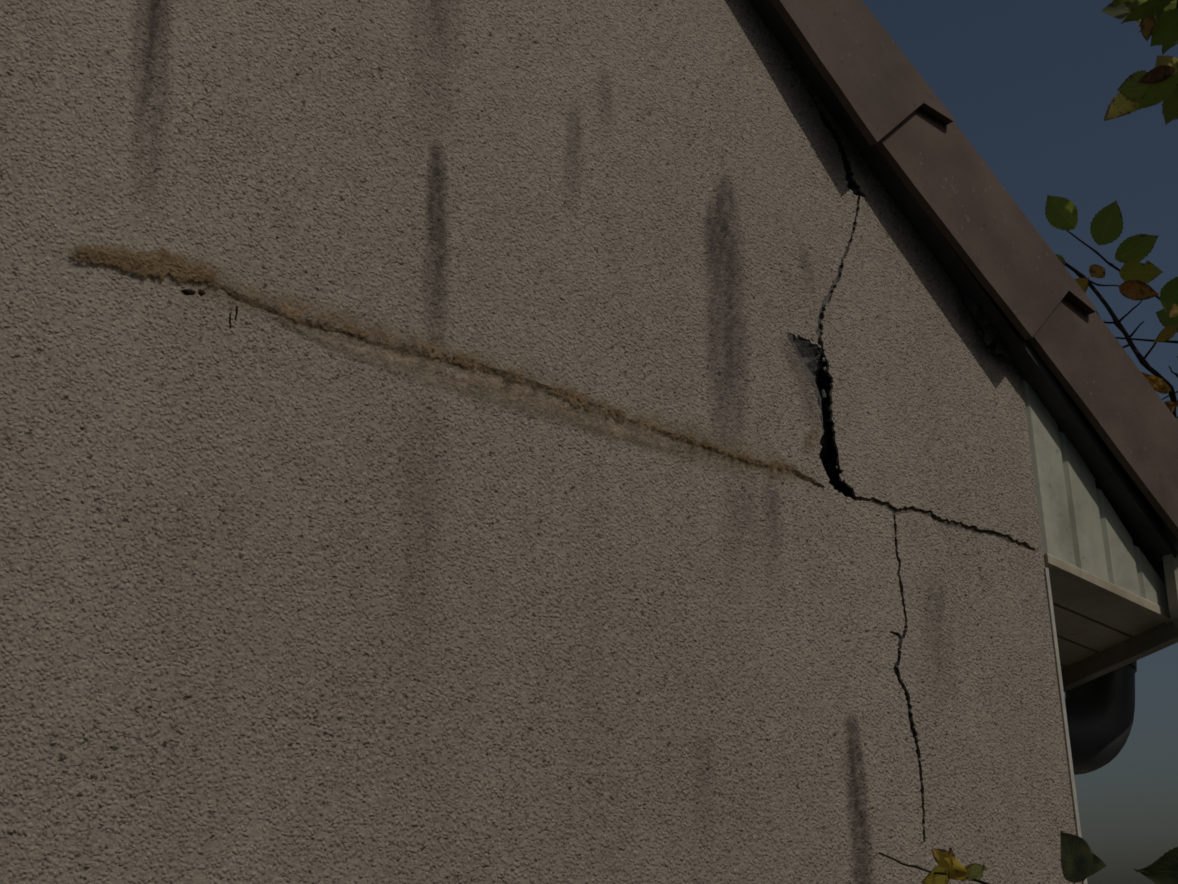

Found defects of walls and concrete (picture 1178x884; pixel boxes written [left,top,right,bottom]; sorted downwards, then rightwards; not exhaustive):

crack [71,102,1033,837]